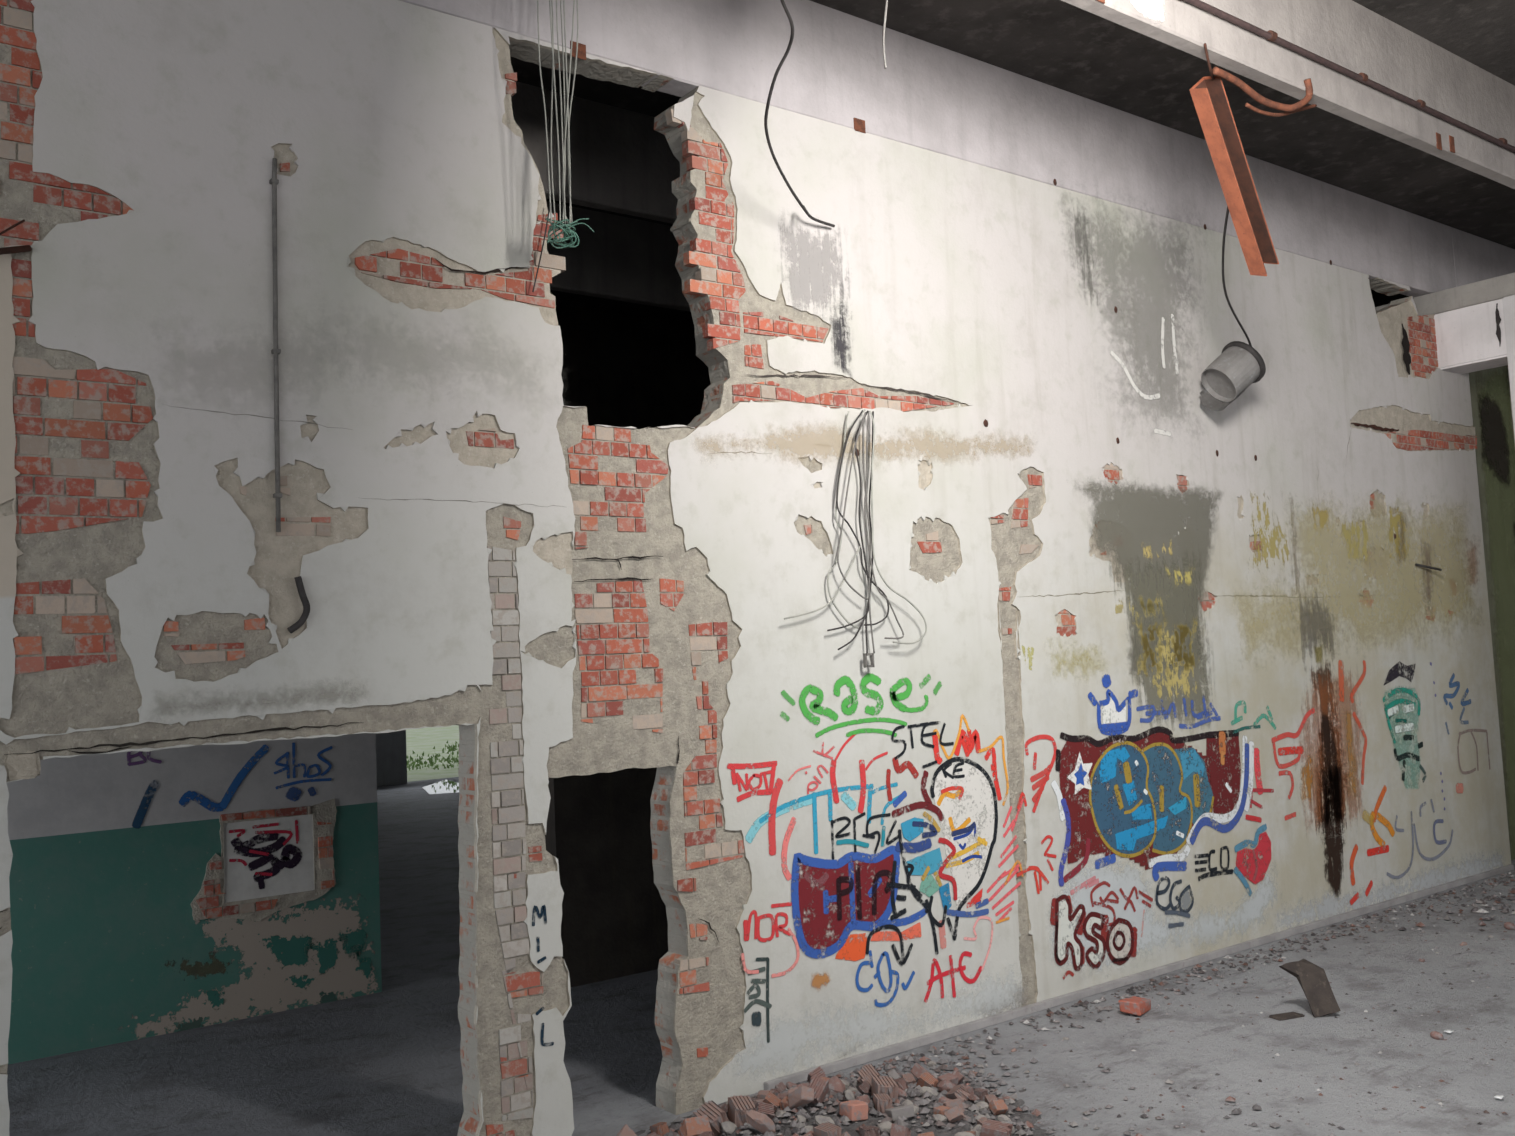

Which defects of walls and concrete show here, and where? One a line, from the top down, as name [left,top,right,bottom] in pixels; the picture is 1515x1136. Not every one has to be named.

spalling [0,0,967,1136]
spalling [988,467,1044,1007]
leakage [1084,484,1217,721]
spalling [1350,405,1477,451]